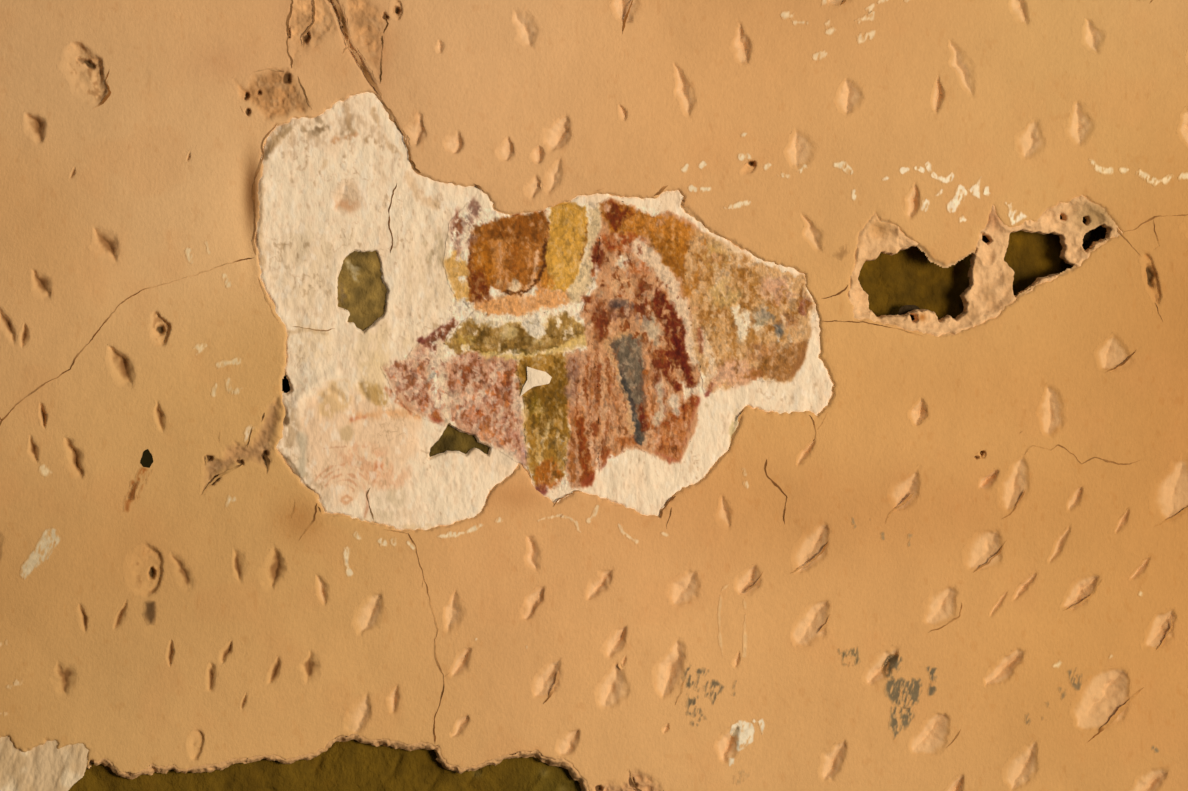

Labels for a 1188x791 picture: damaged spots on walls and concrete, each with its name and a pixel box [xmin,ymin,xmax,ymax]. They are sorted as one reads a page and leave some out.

crack [0,124,279,425]
crack [286,0,421,173]
spalling [199,0,589,577]
spalling [574,239,600,311]
spalling [533,160,805,276]
peeling [738,152,808,180]
spalling [848,161,1123,337]
spalling [537,294,833,516]
crack [661,496,676,528]
crack [384,529,450,741]
spalling [0,733,665,791]